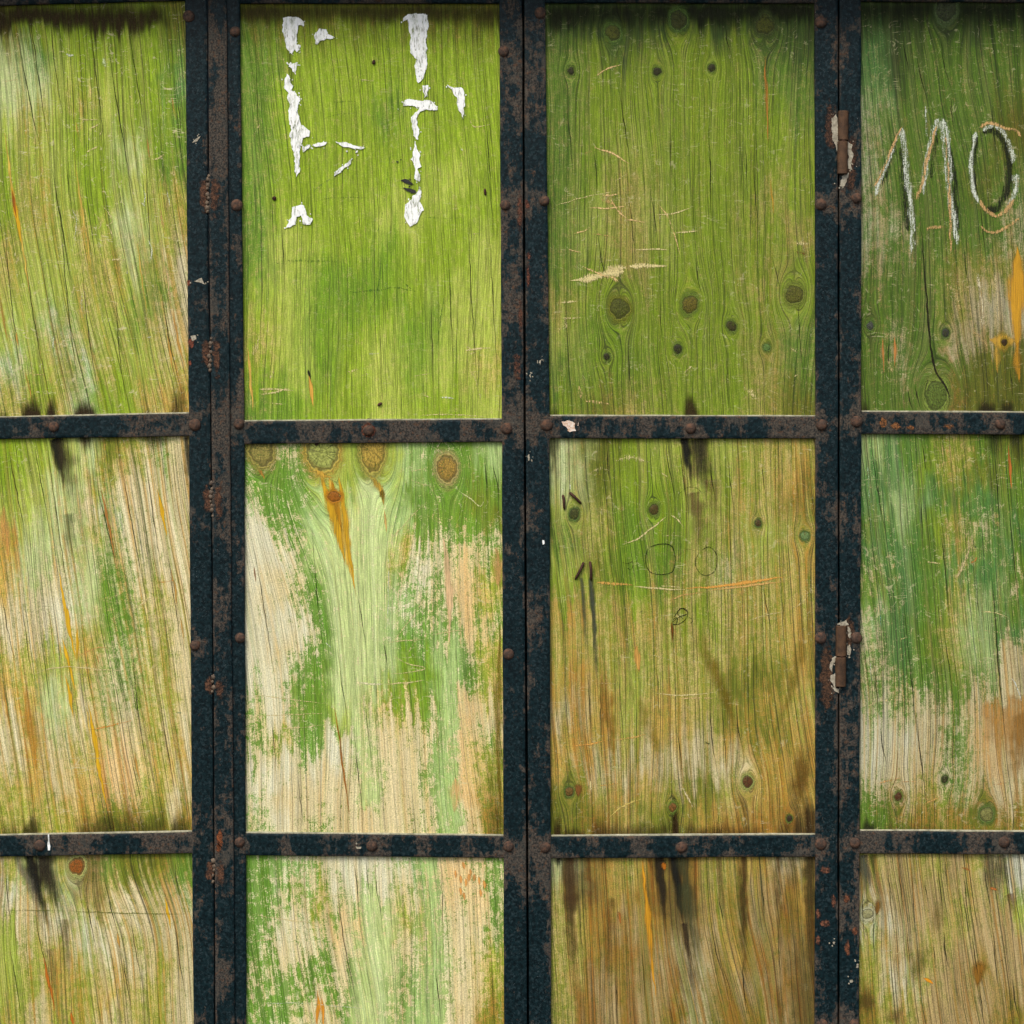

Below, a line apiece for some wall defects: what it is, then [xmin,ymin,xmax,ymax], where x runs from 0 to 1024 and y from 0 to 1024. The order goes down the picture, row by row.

peeling [281,17,364,177]
peeling [396,13,438,226]
peeling [446,85,466,117]
corrosion [825,100,858,191]
peeling [284,202,313,229]
crack [908,222,950,407]
corrosion [819,646,833,708]
damp [17,856,56,917]
corrosion [206,830,224,882]
damp [556,858,576,949]
damp [642,857,695,994]
damp [804,857,815,942]